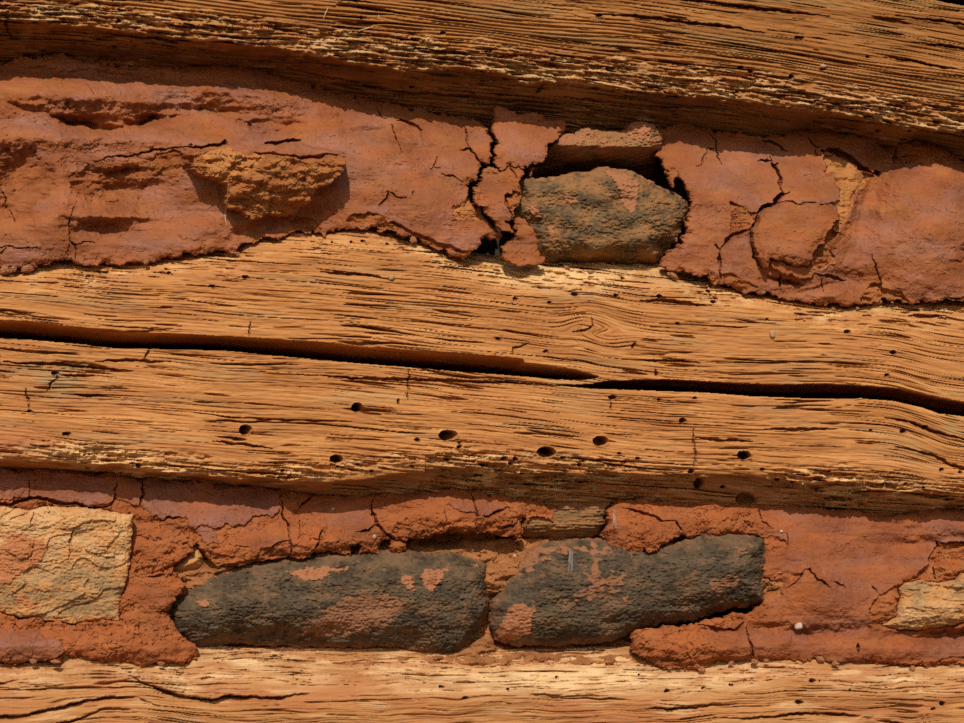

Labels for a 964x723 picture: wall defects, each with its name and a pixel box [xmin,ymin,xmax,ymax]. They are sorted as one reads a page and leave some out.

crack [93,140,228,163]
crack [264,138,302,146]
crack [808,137,899,177]
spalling [0,146,346,234]
crack [715,140,837,291]
crack [640,298,711,307]
crack [0,318,964,471]
peeling [0,468,289,576]
crack [272,495,325,558]
crack [356,500,401,542]
crack [621,507,684,532]
spalling [867,543,964,630]